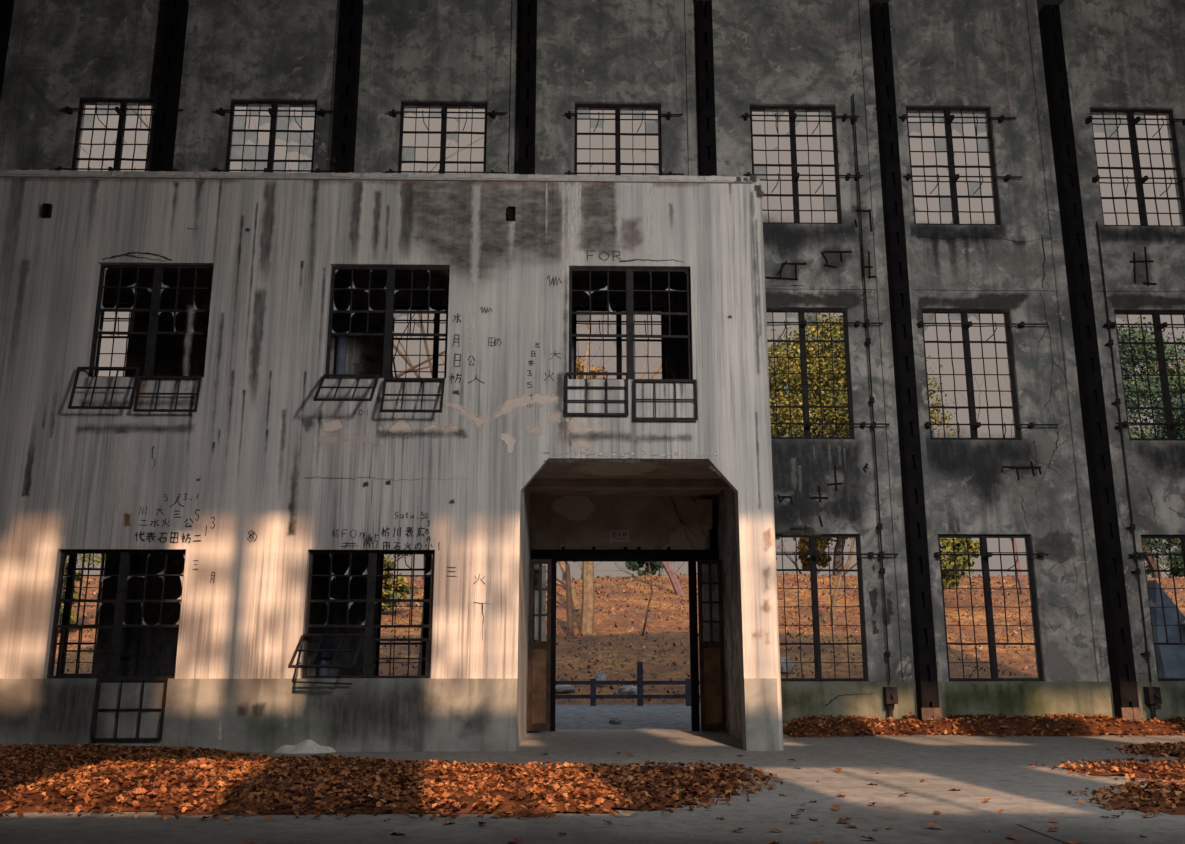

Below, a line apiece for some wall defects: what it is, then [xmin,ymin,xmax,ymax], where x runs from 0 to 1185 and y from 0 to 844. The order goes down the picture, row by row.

water stain [239,185,274,262]
water stain [350,183,362,239]
water stain [374,193,387,246]
water stain [398,182,636,425]
water stain [230,293,263,406]
peeling [323,419,343,432]
water stain [378,397,466,437]
peeling [379,390,721,476]